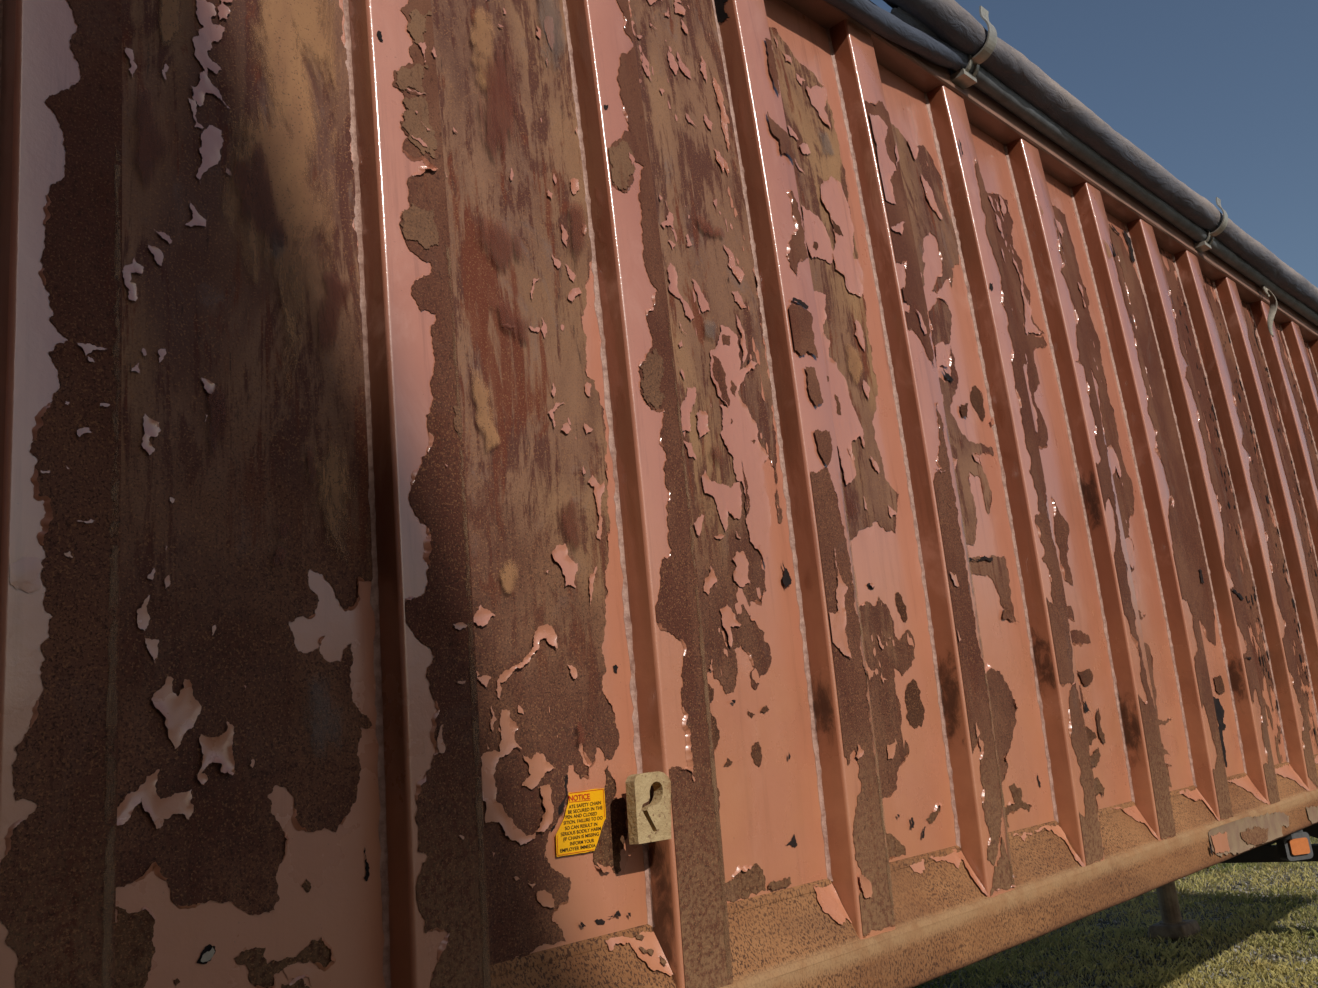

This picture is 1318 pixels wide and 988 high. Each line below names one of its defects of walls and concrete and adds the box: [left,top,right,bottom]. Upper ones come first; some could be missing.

peeling [0,0,373,988]
peeling [393,0,628,988]
rust [647,846,674,959]
peeling [580,0,792,988]
peeling [765,27,1318,938]